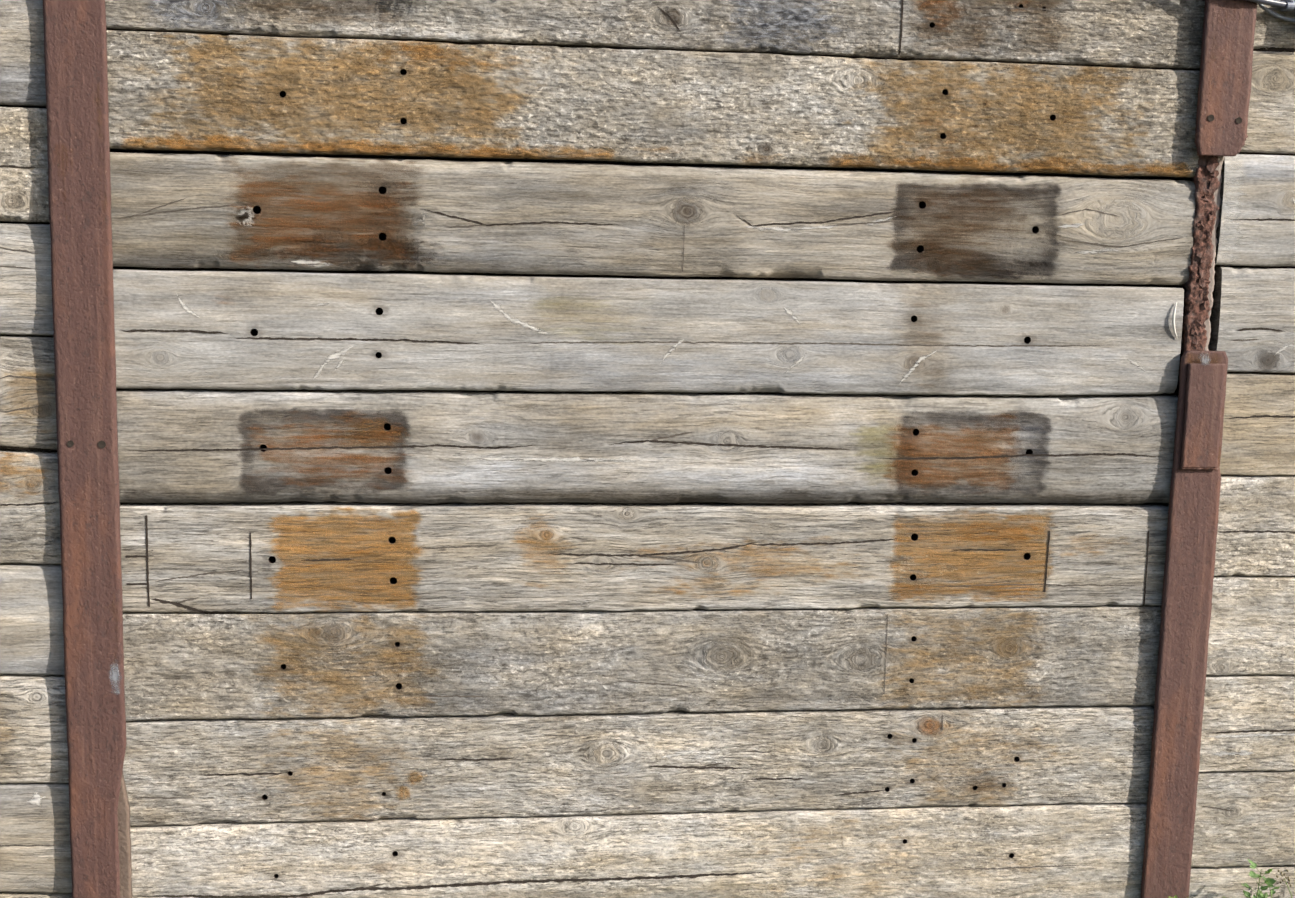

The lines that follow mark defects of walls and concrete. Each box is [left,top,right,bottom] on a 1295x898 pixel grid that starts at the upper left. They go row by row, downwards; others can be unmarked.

damp [238,207,254,226]
crack [737,210,912,226]
corrosion [1180,156,1220,361]